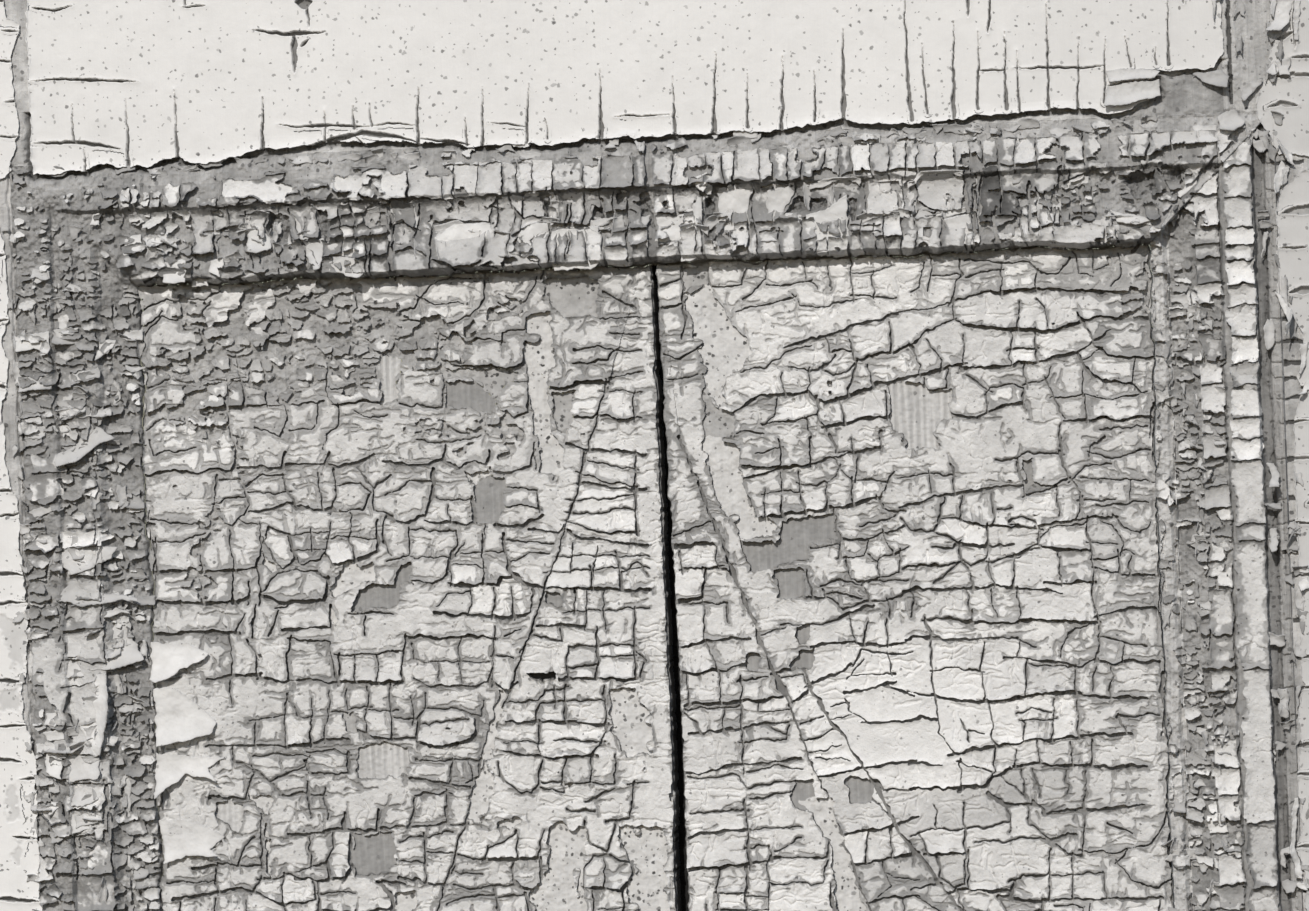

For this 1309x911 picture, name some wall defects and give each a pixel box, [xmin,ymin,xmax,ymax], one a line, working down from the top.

crack [0,0,182,172]
crack [258,81,551,150]
crack [596,26,850,140]
crack [901,0,1188,124]
peeling [1104,68,1161,106]
peeling [1192,70,1230,88]
peeling [1241,0,1301,101]
peeling [7,138,653,911]
crack [137,244,1173,911]
peeling [650,108,1309,911]
crack [0,722,36,784]
peeling [619,824,670,911]